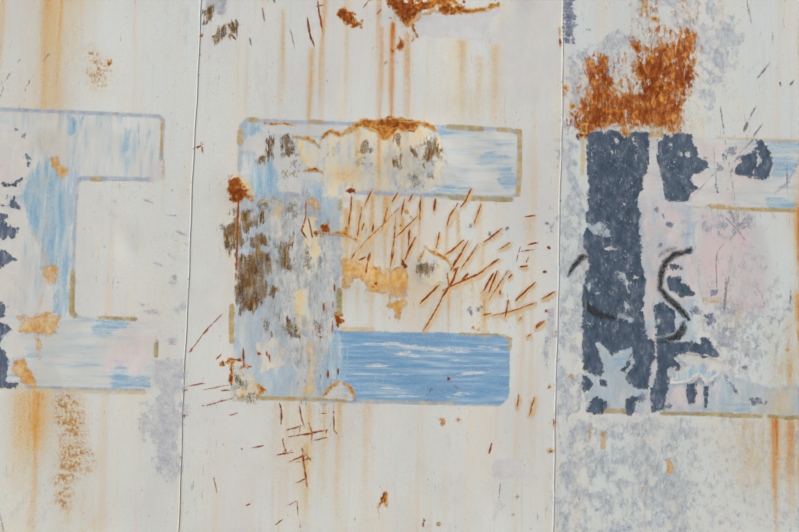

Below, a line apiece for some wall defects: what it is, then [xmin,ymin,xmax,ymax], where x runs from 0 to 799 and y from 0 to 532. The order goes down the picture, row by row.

rust [48,156,68,178]
peeling [263,122,356,147]
rust [226,0,509,346]
rust [555,0,726,151]
rust [11,358,37,389]
rust [17,213,61,360]
peeling [219,348,267,405]
peeling [238,138,357,406]
peeling [415,245,453,290]
peeling [546,0,799,532]
rust [692,153,799,530]
rust [241,392,390,532]